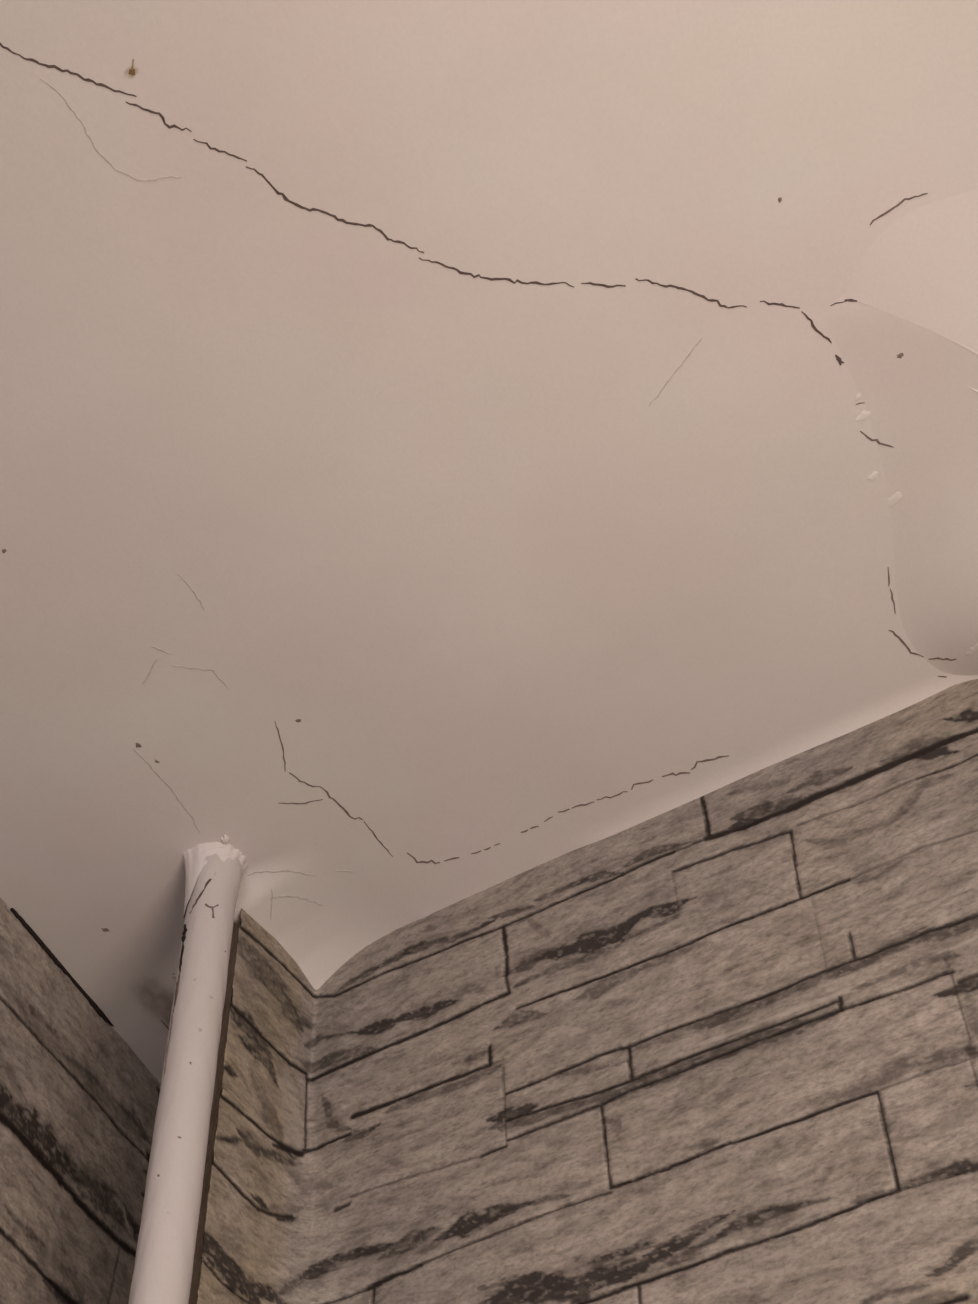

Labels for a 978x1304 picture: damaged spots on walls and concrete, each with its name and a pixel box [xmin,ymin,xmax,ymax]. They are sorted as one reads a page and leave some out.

crack [0,43,857,365]
crack [870,193,928,225]
crack [649,338,702,406]
crack [856,402,894,448]
crack [888,567,957,678]
crack [275,722,729,864]